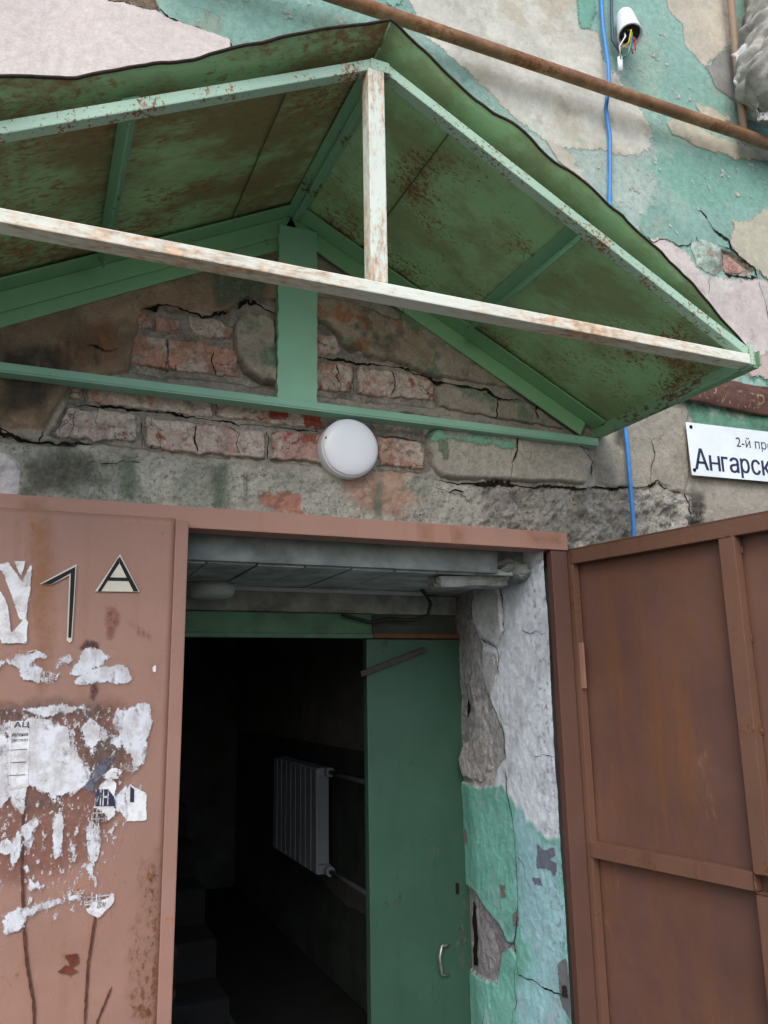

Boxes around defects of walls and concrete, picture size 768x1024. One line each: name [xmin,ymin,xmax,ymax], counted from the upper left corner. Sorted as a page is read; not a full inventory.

peeling [0,0,231,76]
peeling [385,0,649,91]
peeling [667,0,735,100]
peeling [425,35,768,379]
crack [640,210,768,315]
crack [0,427,139,464]
crack [587,439,692,515]
spalling [452,588,506,789]
crack [481,588,562,1020]
peeling [533,845,557,887]
spalling [468,887,519,984]
peeling [558,958,571,1021]